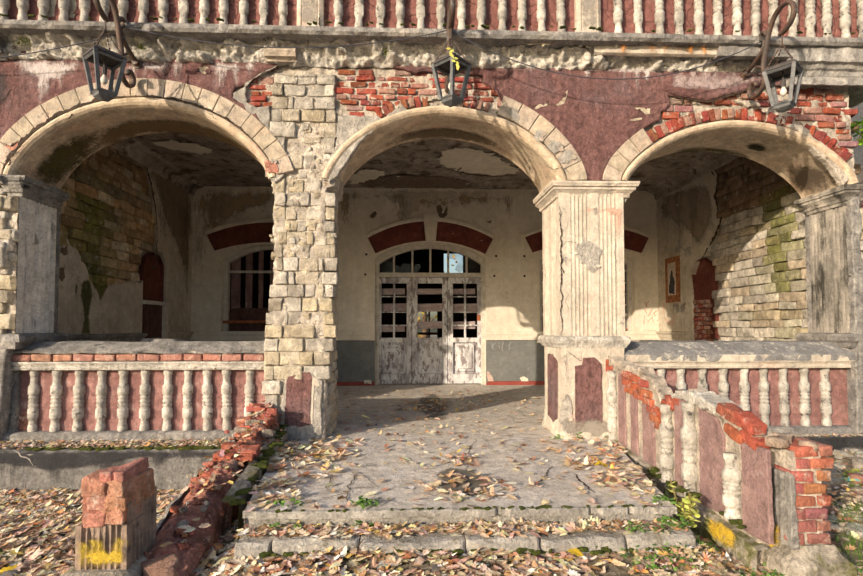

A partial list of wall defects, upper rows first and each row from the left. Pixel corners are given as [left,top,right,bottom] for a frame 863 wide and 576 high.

flaking render [247,77,274,108]
flaking render [335,69,520,124]
flaking render [661,88,859,148]
peeling [152,139,215,155]
peeling [348,148,519,189]
crack [701,170,722,261]
peeling [575,240,602,273]
crack [325,472,379,501]